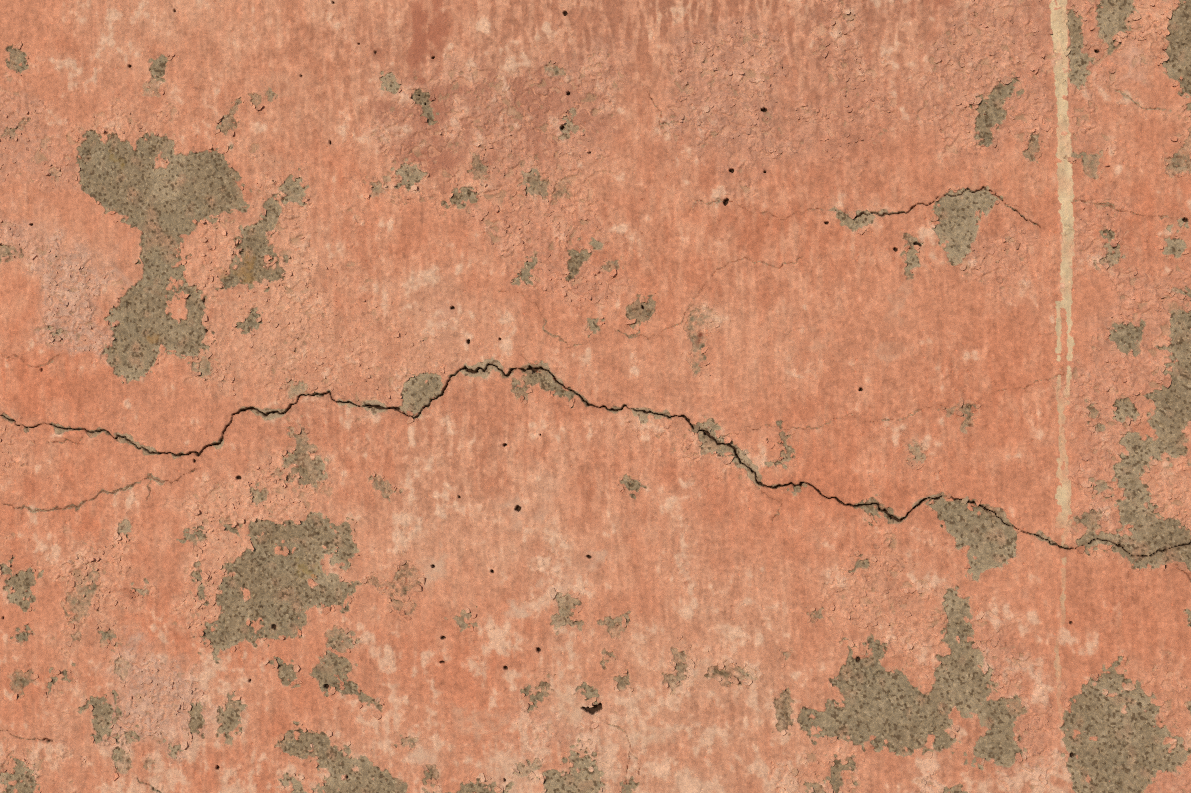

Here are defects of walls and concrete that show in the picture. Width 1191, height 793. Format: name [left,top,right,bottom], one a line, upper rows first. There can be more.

peeling [920,0,1055,163]
peeling [1062,0,1191,180]
peeling [0,51,462,424]
crack [693,187,1041,228]
peeling [901,186,1004,280]
crack [2,258,1191,581]
peeling [0,520,248,781]
peeling [173,415,427,720]
peeling [549,588,634,691]
peeling [769,493,1191,793]
peeling [272,721,408,793]
peeling [422,739,640,793]